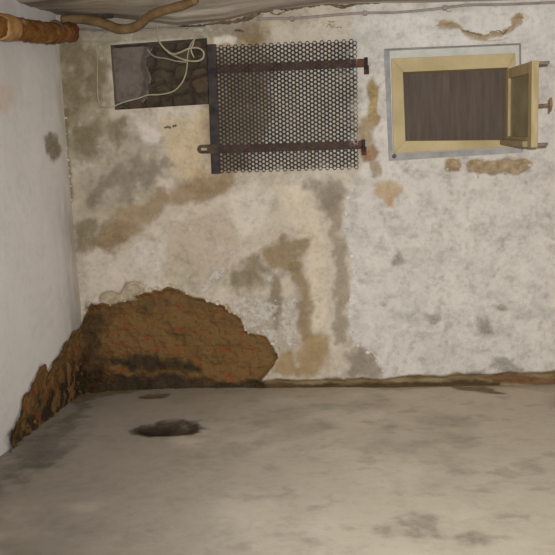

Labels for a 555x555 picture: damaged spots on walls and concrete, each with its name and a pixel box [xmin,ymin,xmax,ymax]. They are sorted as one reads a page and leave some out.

leakage [46,133,60,159]
flaking render [445,157,532,178]
leakage [76,171,232,249]
leakage [232,236,327,376]
flaking render [10,283,555,448]